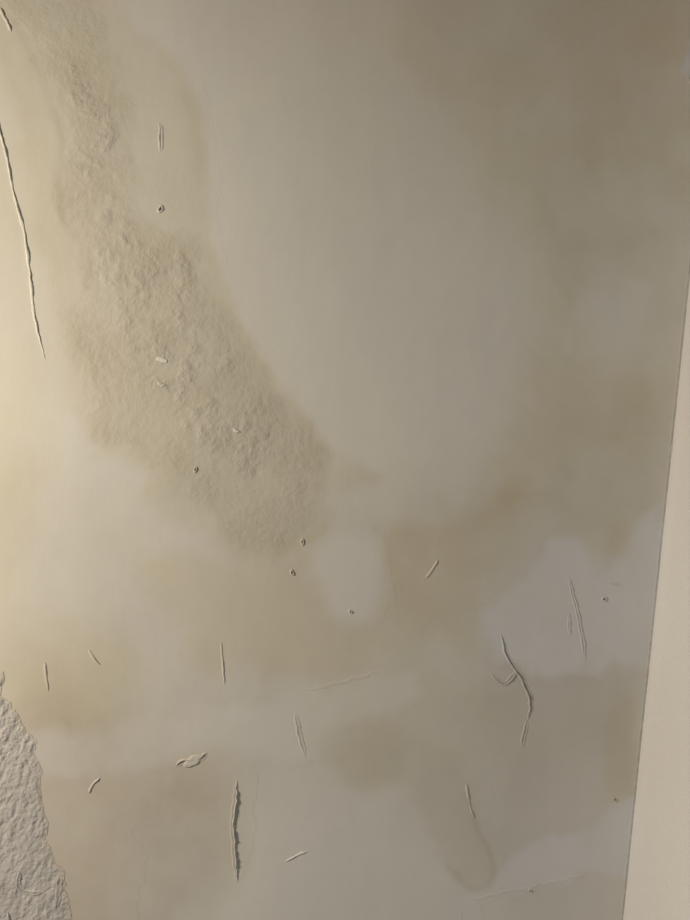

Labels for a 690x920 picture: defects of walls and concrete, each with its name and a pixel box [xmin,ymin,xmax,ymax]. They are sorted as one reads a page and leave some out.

leakage [0,0,545,893]
leakage [370,0,690,551]
flaking render [0,671,71,920]
leakage [40,753,258,920]